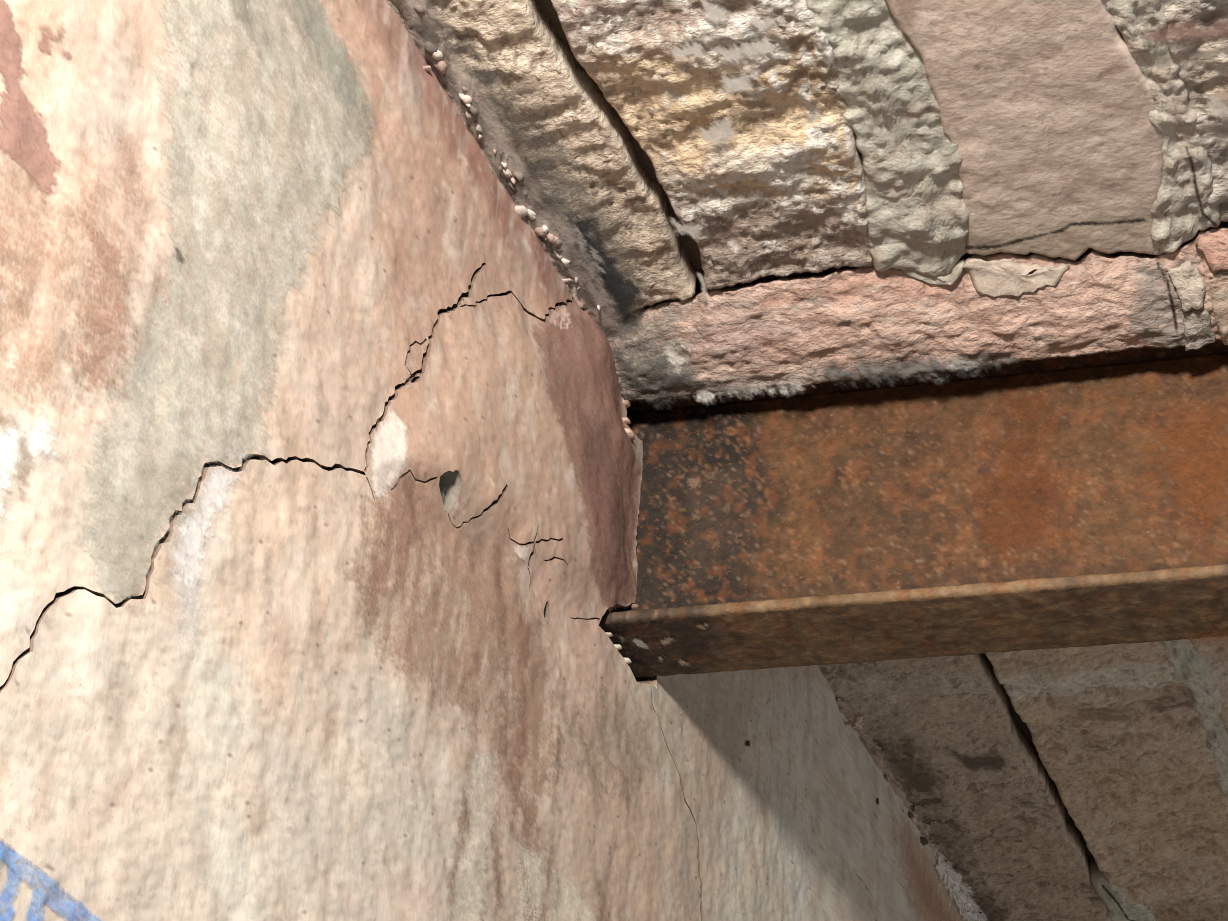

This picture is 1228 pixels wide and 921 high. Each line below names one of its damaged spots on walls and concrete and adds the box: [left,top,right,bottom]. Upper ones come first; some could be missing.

peeling [39,25,72,58]
peeling [0,0,60,193]
crack [1186,147,1228,227]
crack [764,266,850,280]
crack [959,218,1177,329]
crack [0,265,574,692]
peeling [370,410,408,498]
crack [1007,694,1033,743]
crack [1053,781,1091,853]
crack [1101,885,1135,921]